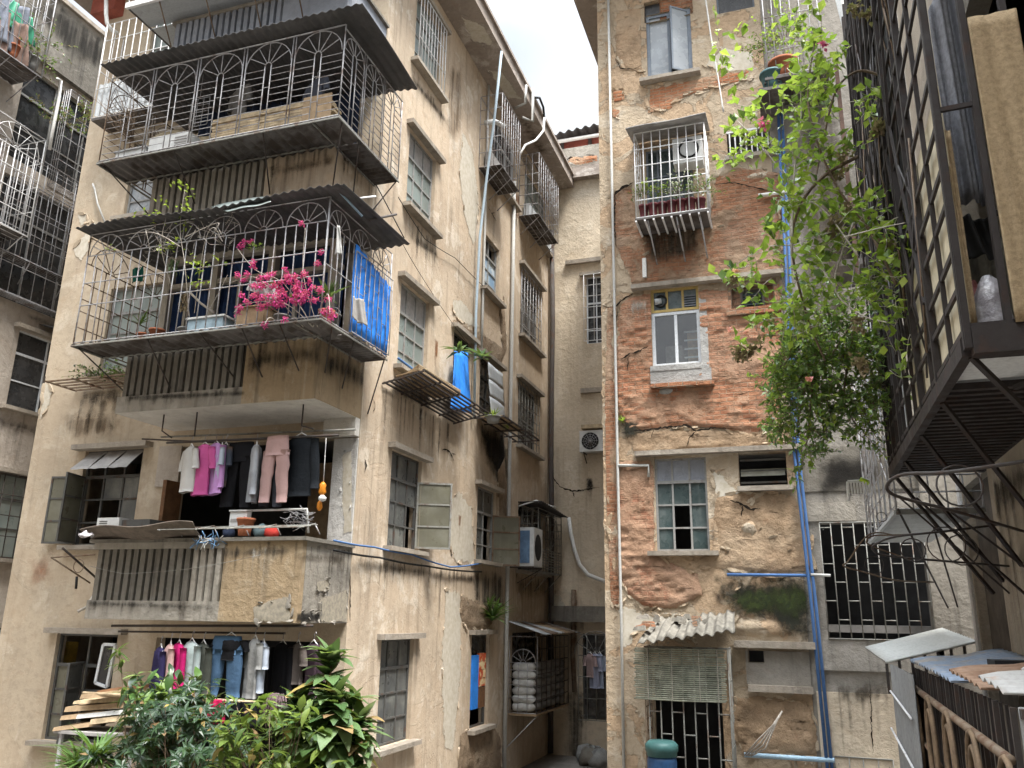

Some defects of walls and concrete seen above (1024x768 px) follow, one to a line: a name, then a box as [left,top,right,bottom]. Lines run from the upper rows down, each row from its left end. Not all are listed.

peeling [611,87,626,119]
peeling [644,46,759,113]
crack [614,182,633,241]
leakage [76,389,115,432]
crack [624,424,733,445]
peeling [601,166,818,648]
crack [730,500,760,516]
spalling [253,577,349,627]
leakage [716,576,810,640]